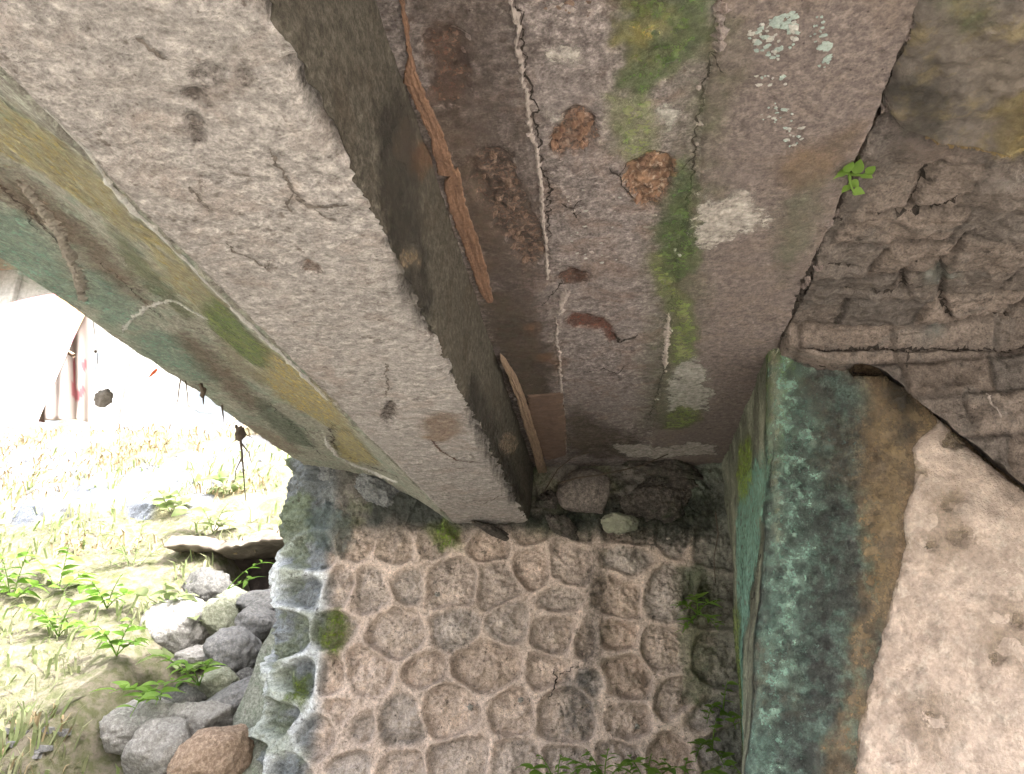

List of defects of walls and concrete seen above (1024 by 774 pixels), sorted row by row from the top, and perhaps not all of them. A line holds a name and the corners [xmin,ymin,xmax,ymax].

spalling [549,105,600,159]
damp [656,103,679,131]
crack [682,0,725,211]
crack [269,149,348,222]
spalling [469,146,545,264]
spalling [558,150,679,284]
damp [687,190,772,249]
corrosion [565,313,638,343]
crack [647,238,682,419]
damp [666,357,716,412]